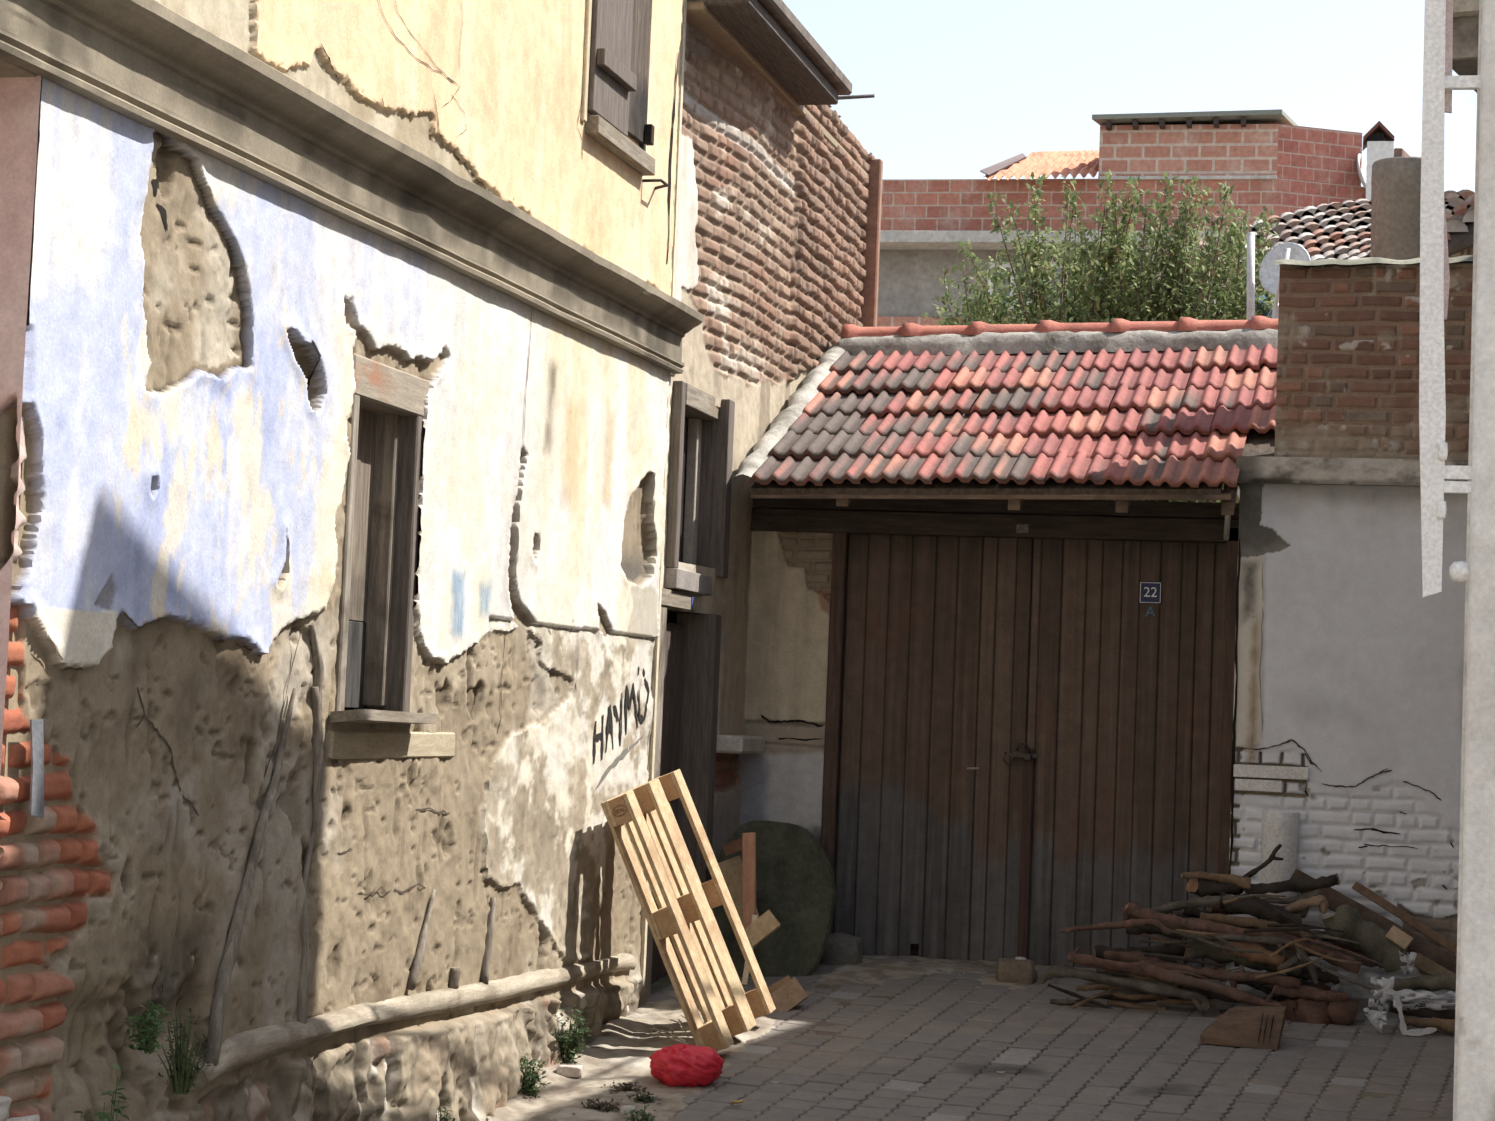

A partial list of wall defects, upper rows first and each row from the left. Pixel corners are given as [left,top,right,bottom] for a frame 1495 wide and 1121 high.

peeling [156,0,529,214]
flaking render [140,132,249,393]
flaking render [287,332,324,410]
flaking render [621,474,658,649]
crack [1229,539,1454,874]
peeling [1398,903,1458,957]